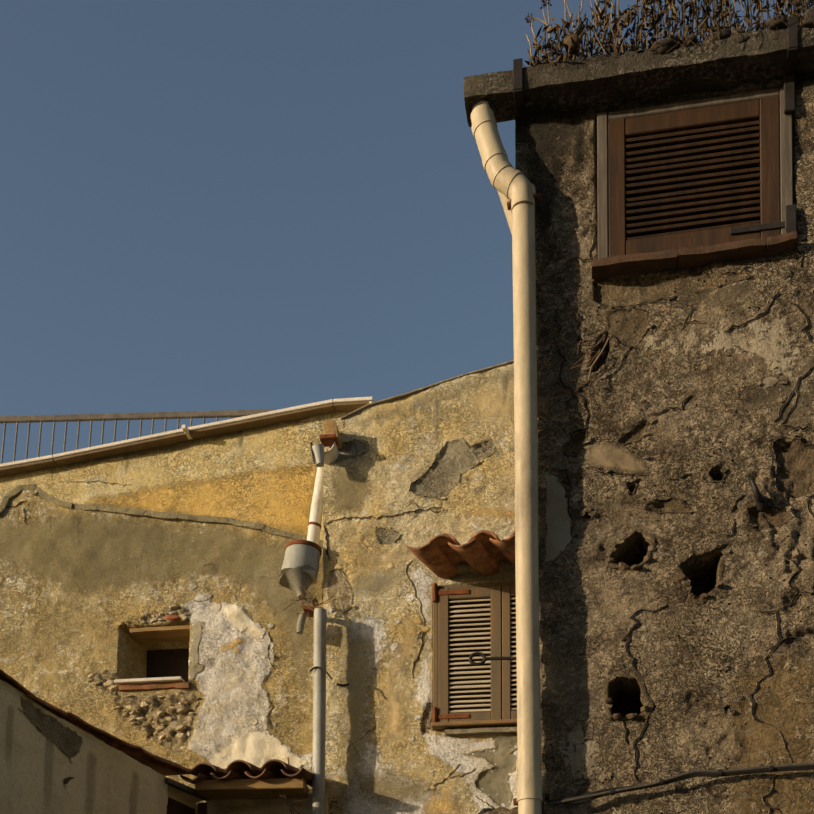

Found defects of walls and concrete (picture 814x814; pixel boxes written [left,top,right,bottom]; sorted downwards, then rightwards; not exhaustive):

crack [6,492,42,525]
crack [67,479,132,487]
spalling [409,438,496,500]
spalling [540,475,595,566]
spalling [603,527,655,571]
flaking render [85,583,313,770]
crack [405,561,425,678]
flaking render [326,526,518,814]
spalling [602,671,654,723]
crack [622,605,668,672]
crack [748,547,814,814]
crack [622,716,649,781]